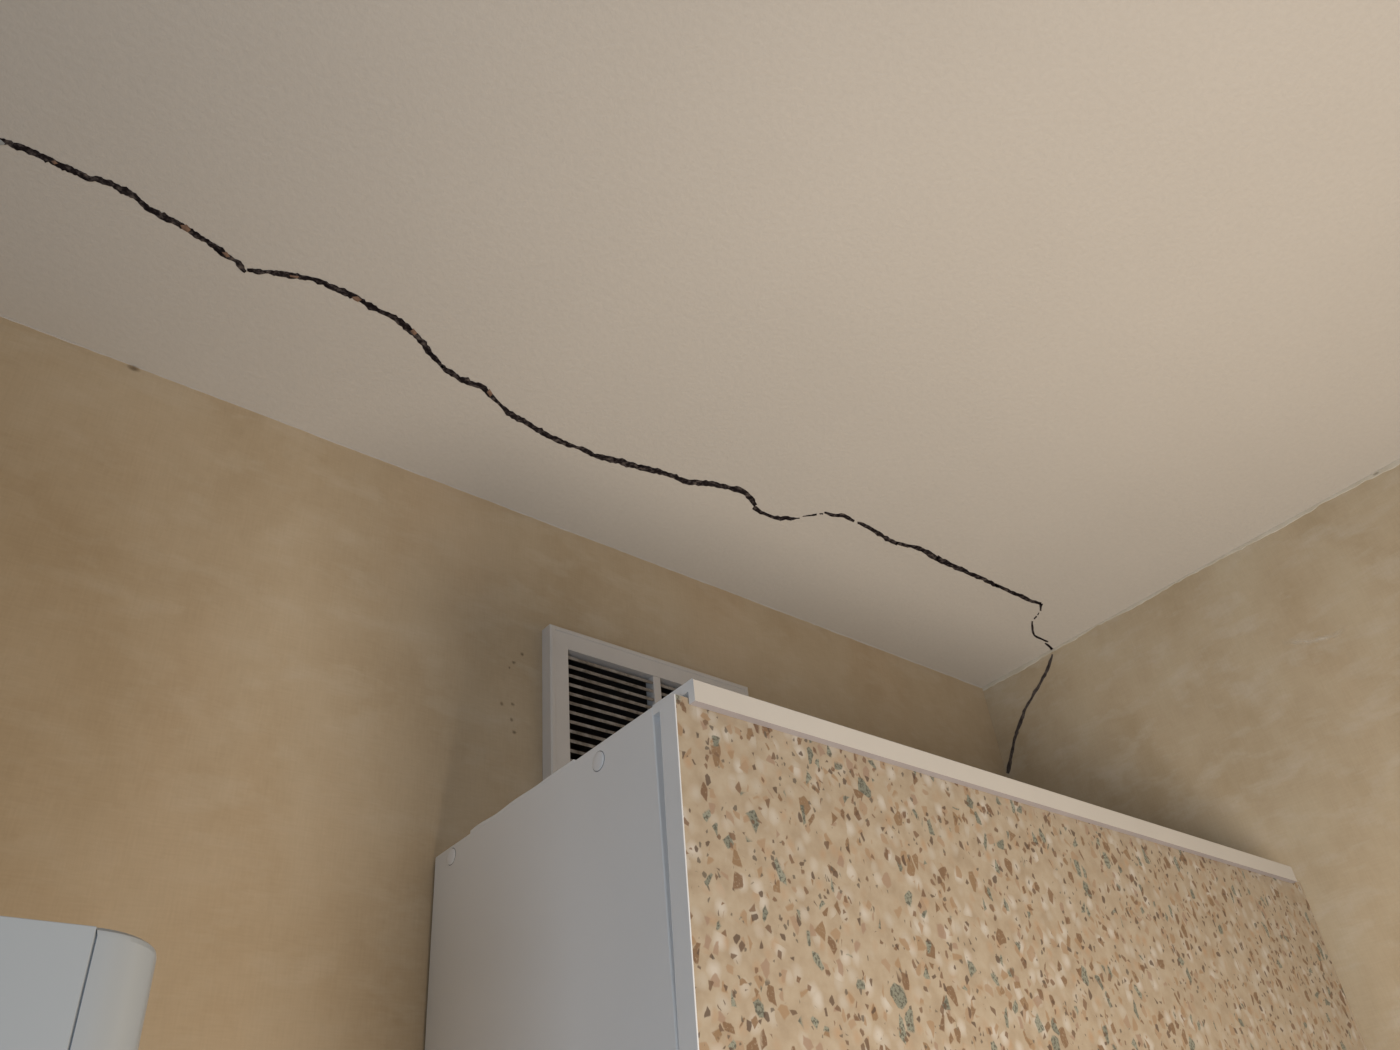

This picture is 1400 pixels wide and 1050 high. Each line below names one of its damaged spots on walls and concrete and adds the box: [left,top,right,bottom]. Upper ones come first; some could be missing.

crack [0,138,1053,774]